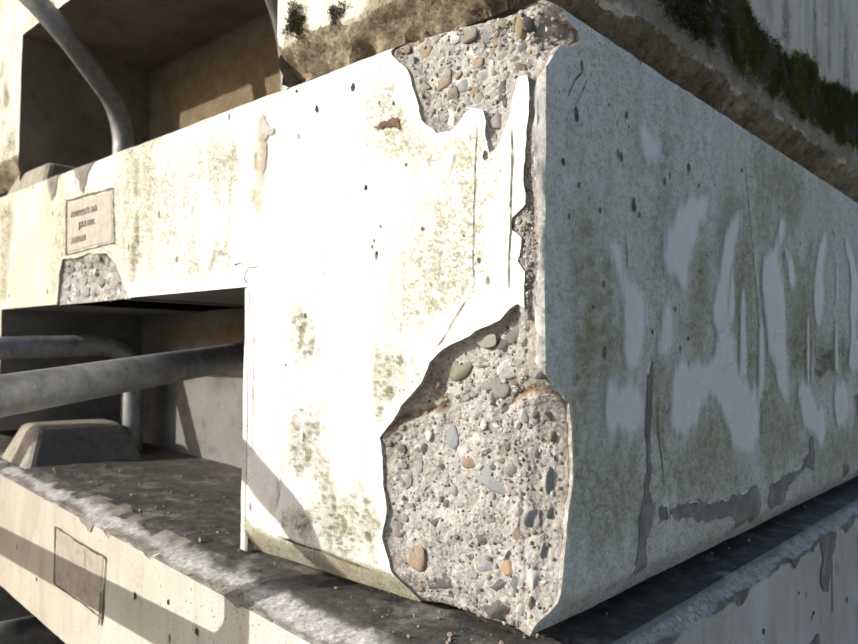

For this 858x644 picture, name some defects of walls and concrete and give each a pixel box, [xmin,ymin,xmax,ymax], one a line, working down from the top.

corrosion [249,114,273,212]
corrosion [373,117,400,130]
spalling [58,253,131,305]
crack [432,124,477,352]
spalling [383,2,575,633]
peeling [629,360,815,578]
peeling [705,514,858,616]